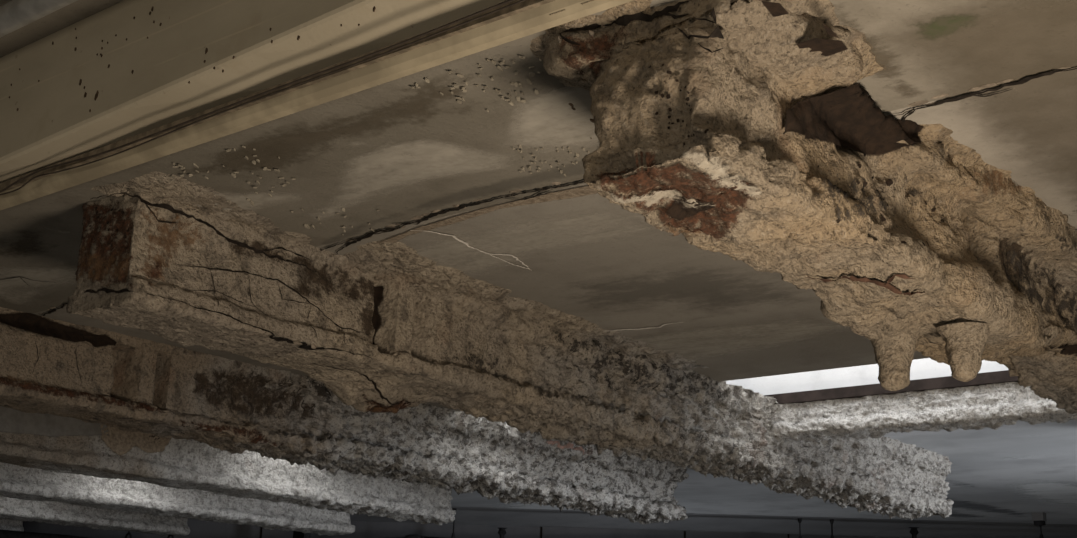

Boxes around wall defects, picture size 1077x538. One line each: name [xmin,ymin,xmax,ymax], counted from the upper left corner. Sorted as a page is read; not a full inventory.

crack [678,7,726,53]
damp [199,85,458,172]
damp [328,141,503,214]
damp [513,87,599,145]
rust [683,152,730,171]
spalling [783,84,924,168]
rust [75,201,202,288]
crack [0,181,584,405]
peeling [80,334,117,348]